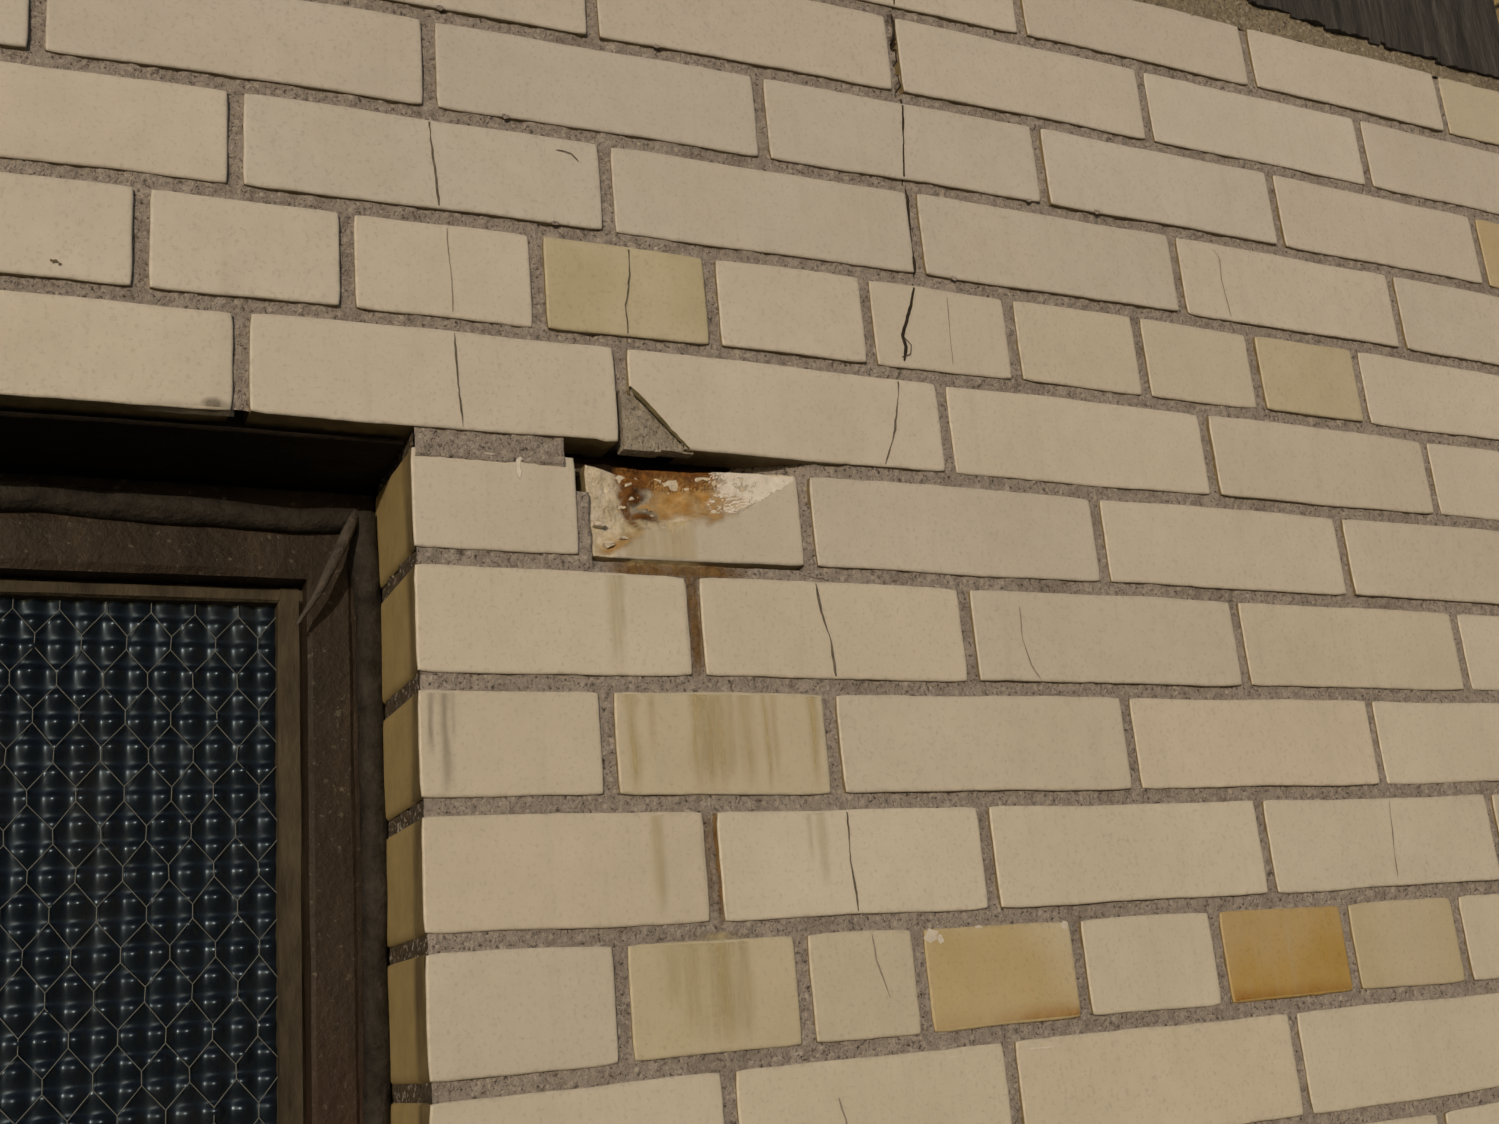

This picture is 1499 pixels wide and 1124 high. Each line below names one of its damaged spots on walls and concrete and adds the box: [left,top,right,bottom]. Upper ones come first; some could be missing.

crack [427,119,463,423]
crack [624,249,632,342]
crack [885,0,953,464]
spalling [575,381,804,571]
crack [815,584,837,680]
crack [844,807,891,998]